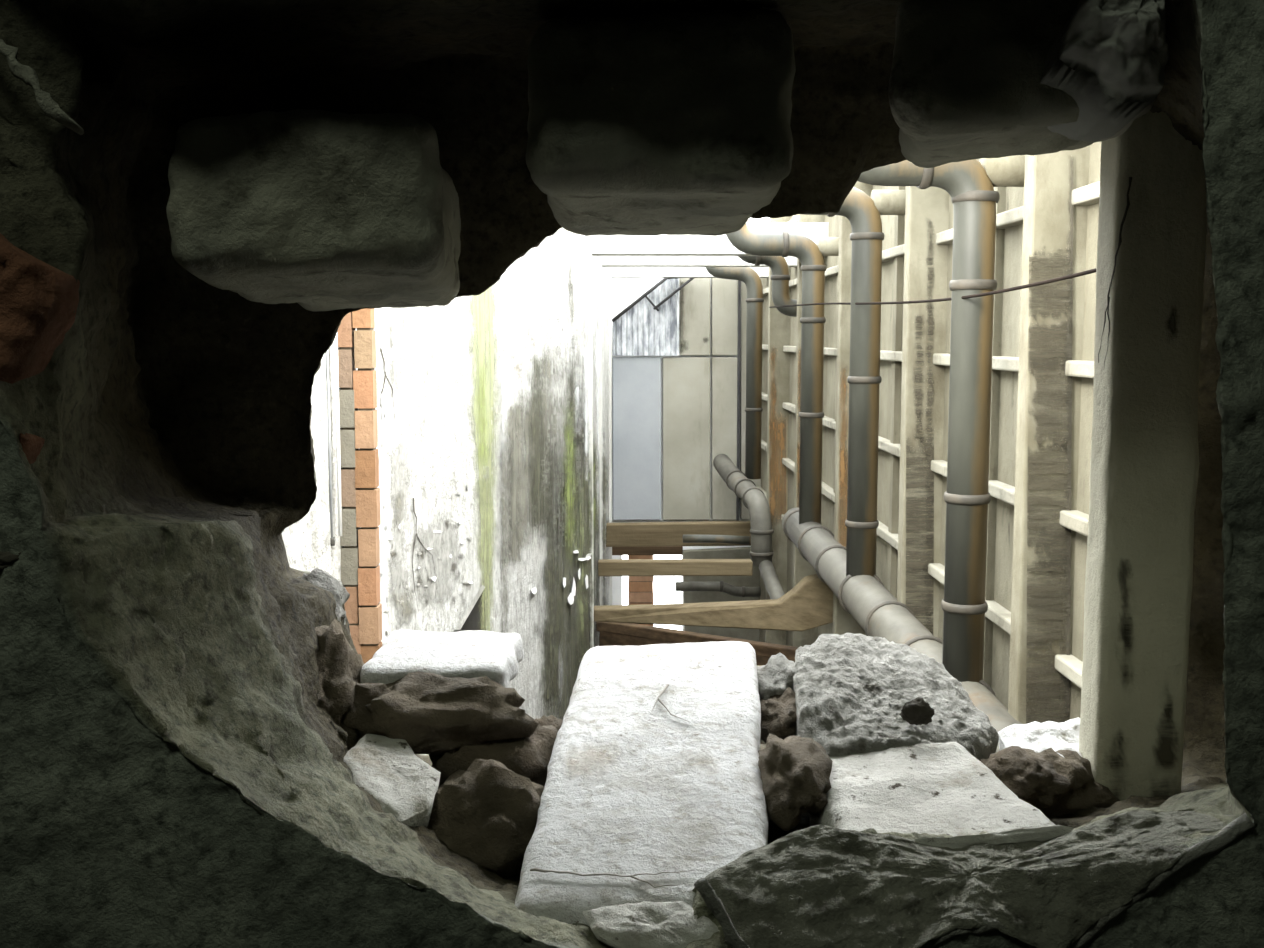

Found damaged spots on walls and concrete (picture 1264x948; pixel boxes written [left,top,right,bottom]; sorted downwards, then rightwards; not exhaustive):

crack [1098,177,1132,366]
flaking render [376,308,486,643]
damp [471,286,607,720]
peeling [563,550,592,605]
damp [1121,617,1131,678]
spalling [344,734,441,827]
spalling [899,697,935,726]
damp [1154,703,1177,767]
spalling [583,810,1255,948]